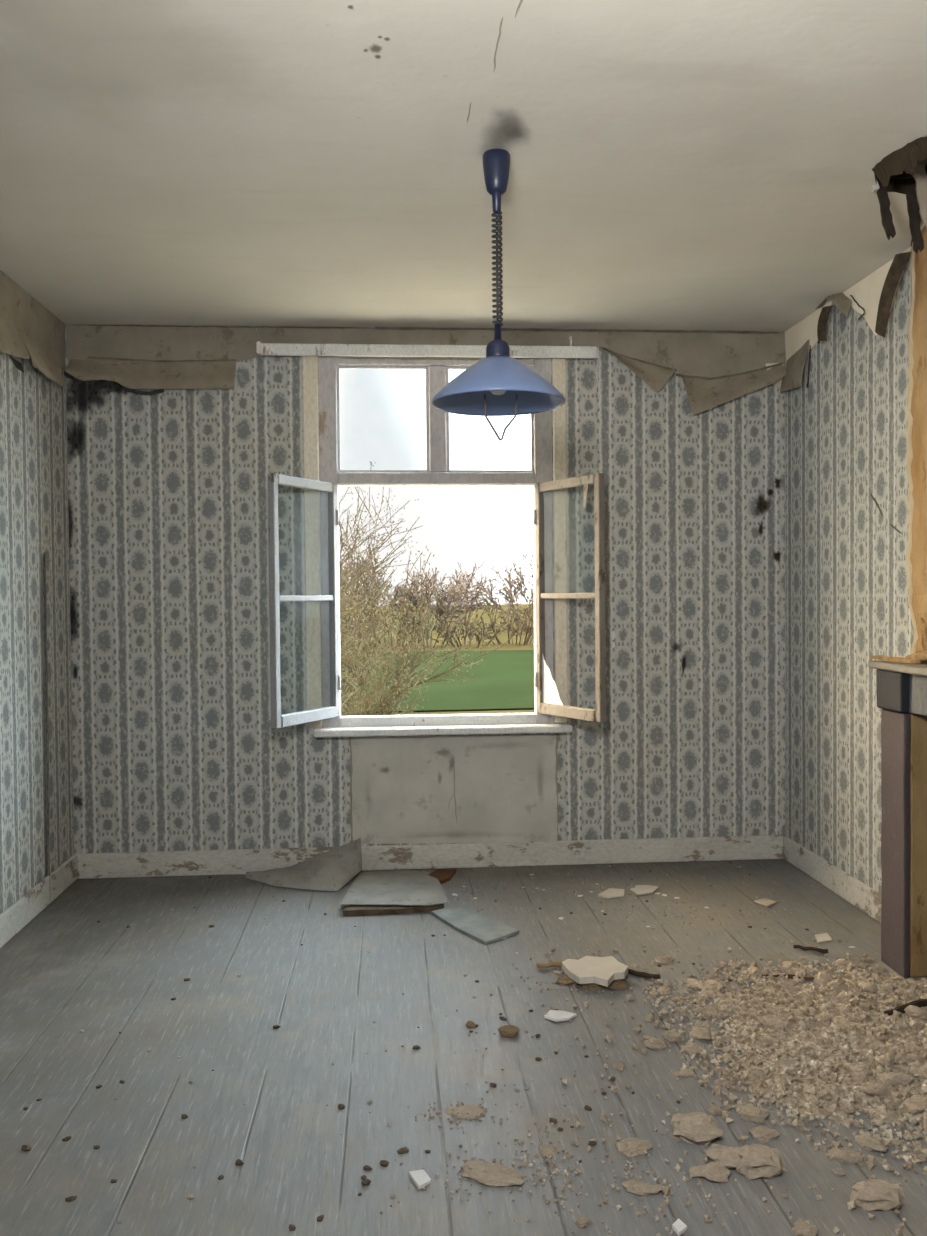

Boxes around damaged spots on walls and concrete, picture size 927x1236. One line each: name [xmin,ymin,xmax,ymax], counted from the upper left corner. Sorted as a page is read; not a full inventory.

crack [493,0,523,72]
flaking render [871,136,927,193]
flaking render [0,270,65,371]
flaking render [257,327,598,360]
damp [66,380,126,455]
flaking render [785,210,927,654]
damp [70,592,78,638]